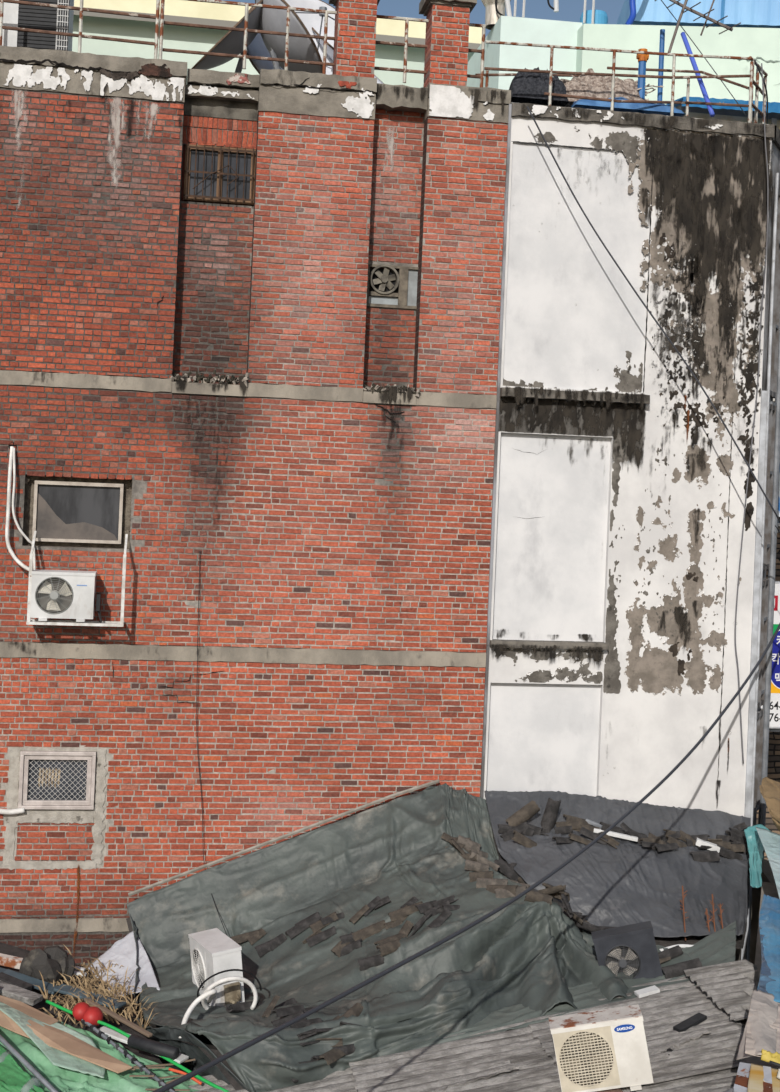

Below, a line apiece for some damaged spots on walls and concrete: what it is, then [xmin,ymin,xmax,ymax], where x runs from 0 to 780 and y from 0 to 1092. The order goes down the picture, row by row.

damp [14,90,27,144]
peeling [4,63,254,101]
damp [103,82,158,183]
peeling [338,81,374,118]
peeling [429,84,495,121]
damp [622,112,774,468]
damp [212,375,250,396]
damp [379,386,413,438]
damp [498,386,646,469]
peeling [494,105,770,696]
damp [687,426,712,480]
damp [660,601,697,648]